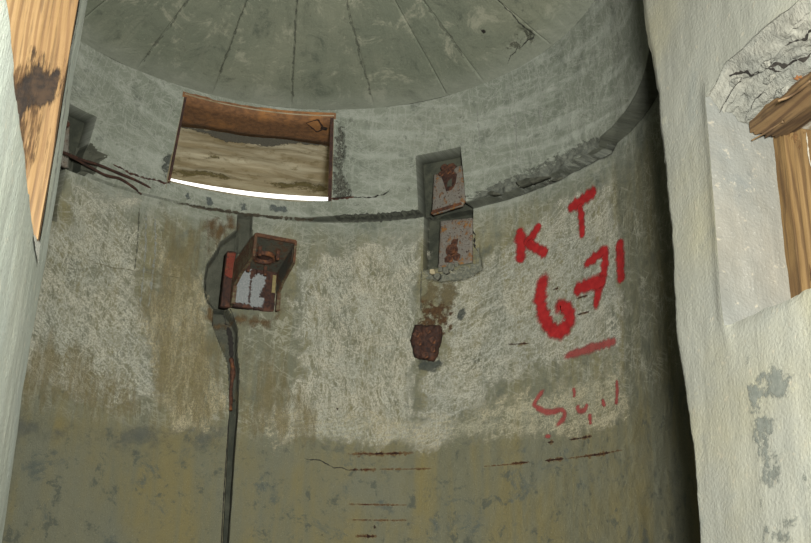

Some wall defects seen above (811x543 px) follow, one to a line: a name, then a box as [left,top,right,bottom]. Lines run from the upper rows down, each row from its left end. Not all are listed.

spalling [713,0,811,125]
crack [719,29,811,120]
spalling [467,138,616,200]
corrosion [545,450,621,462]